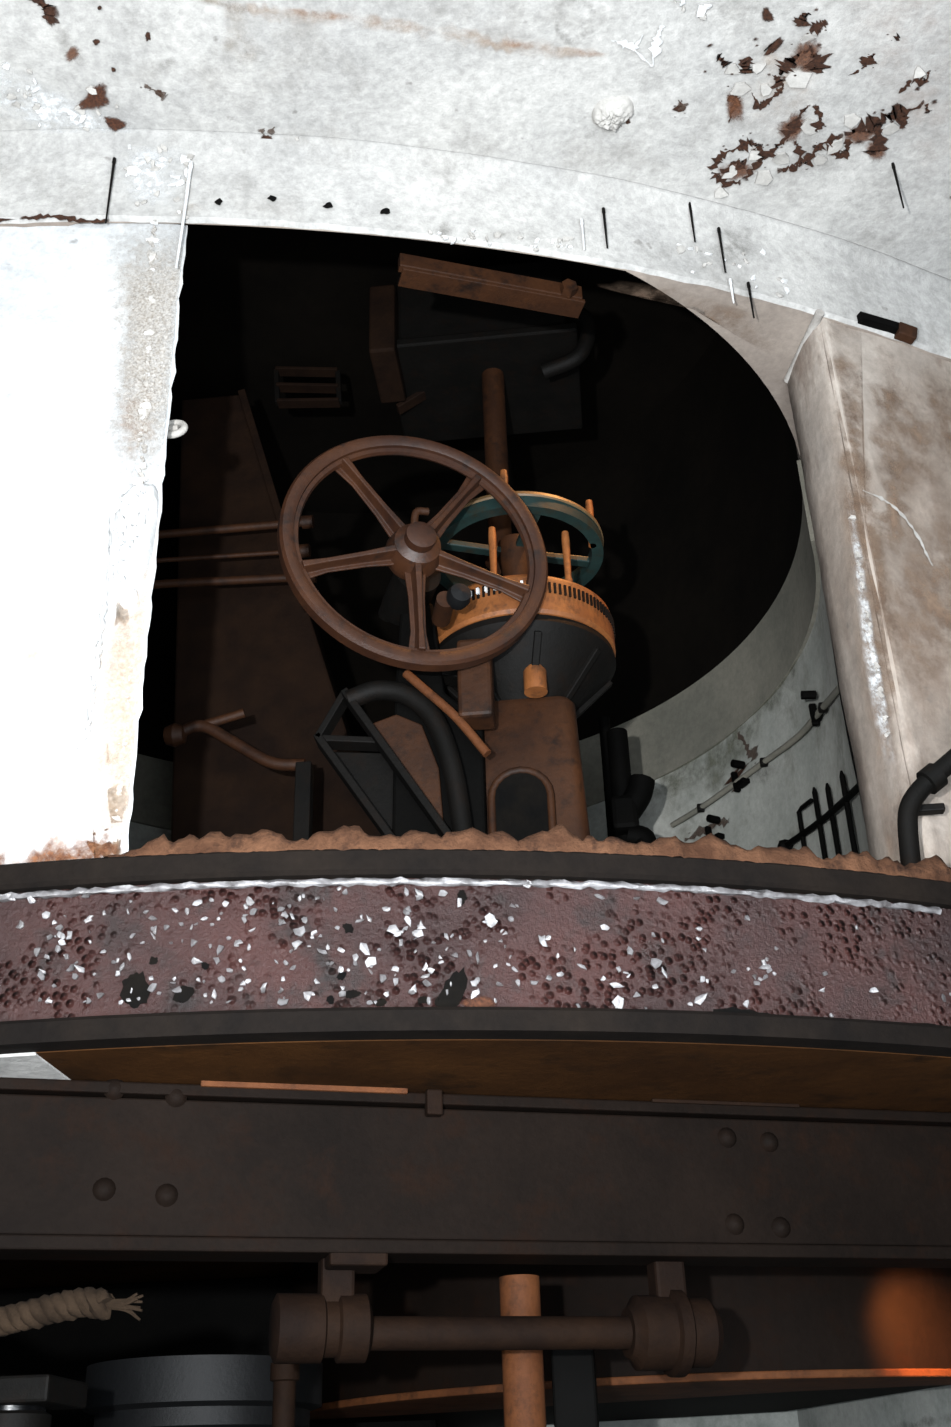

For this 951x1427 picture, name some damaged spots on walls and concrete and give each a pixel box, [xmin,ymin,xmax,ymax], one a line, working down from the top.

crack [0,213,109,223]